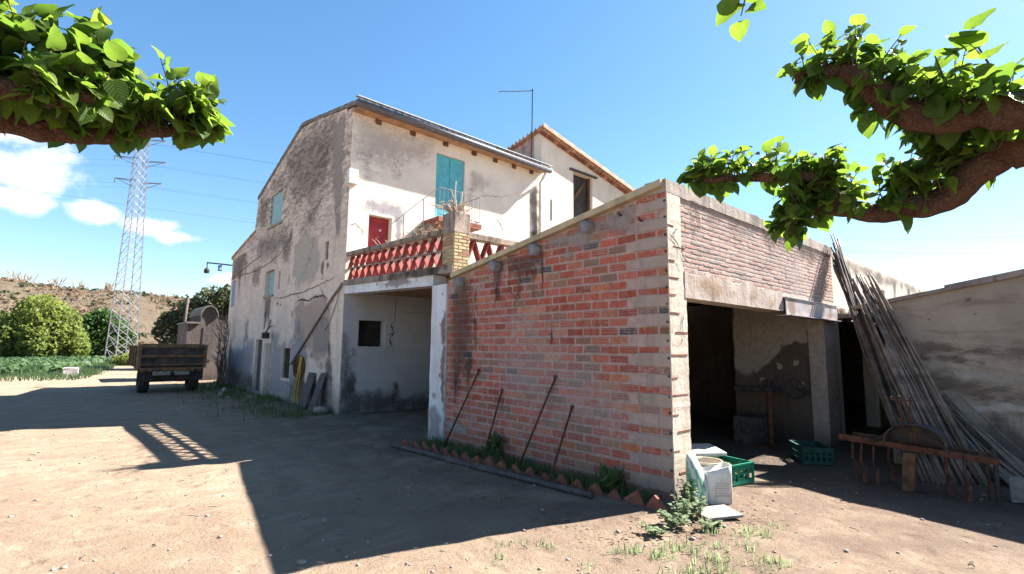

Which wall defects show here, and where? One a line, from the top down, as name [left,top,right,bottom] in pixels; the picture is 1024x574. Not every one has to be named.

crack [237,240,336,332]
peeling [733,308,808,381]
water stain [344,373,429,414]